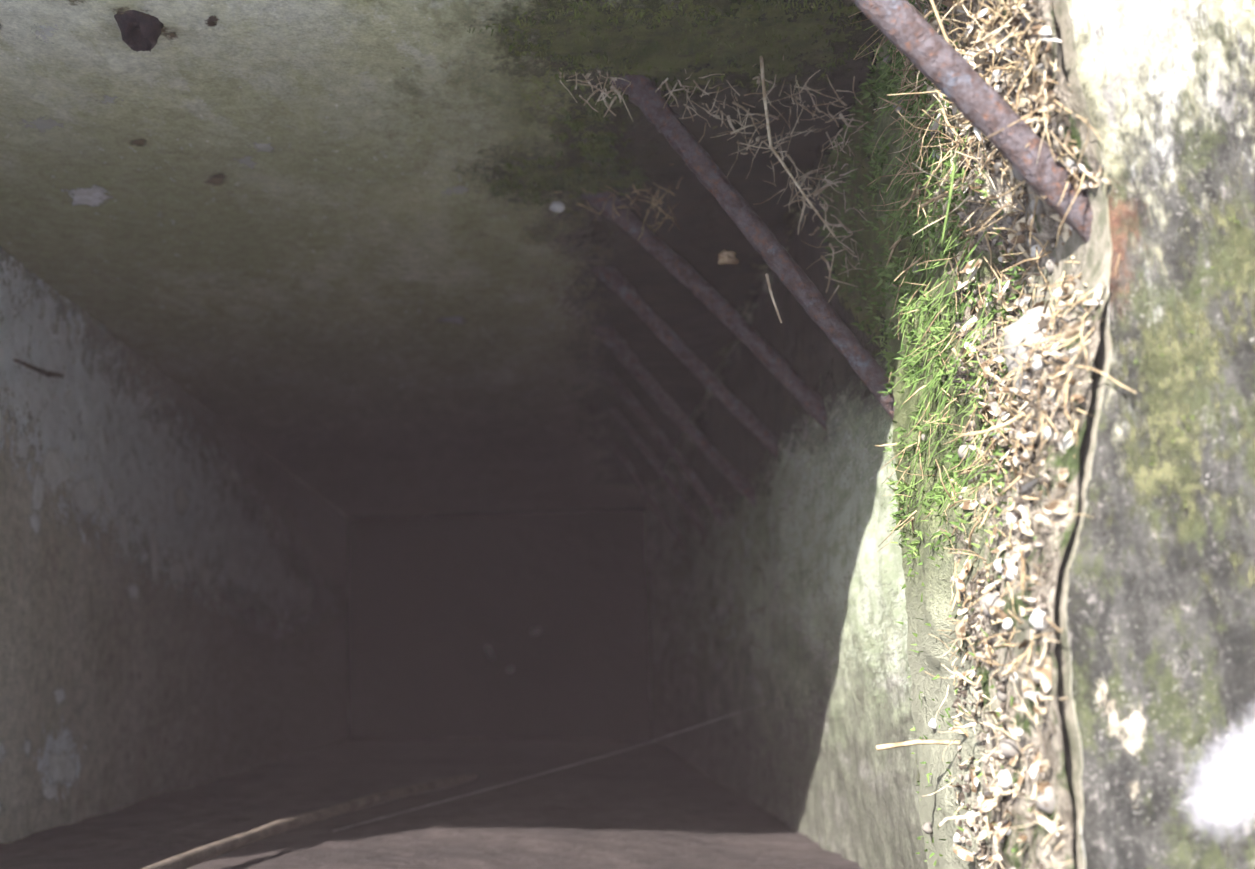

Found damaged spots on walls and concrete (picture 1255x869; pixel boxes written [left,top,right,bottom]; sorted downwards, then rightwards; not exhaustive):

rust [611,73,680,133]